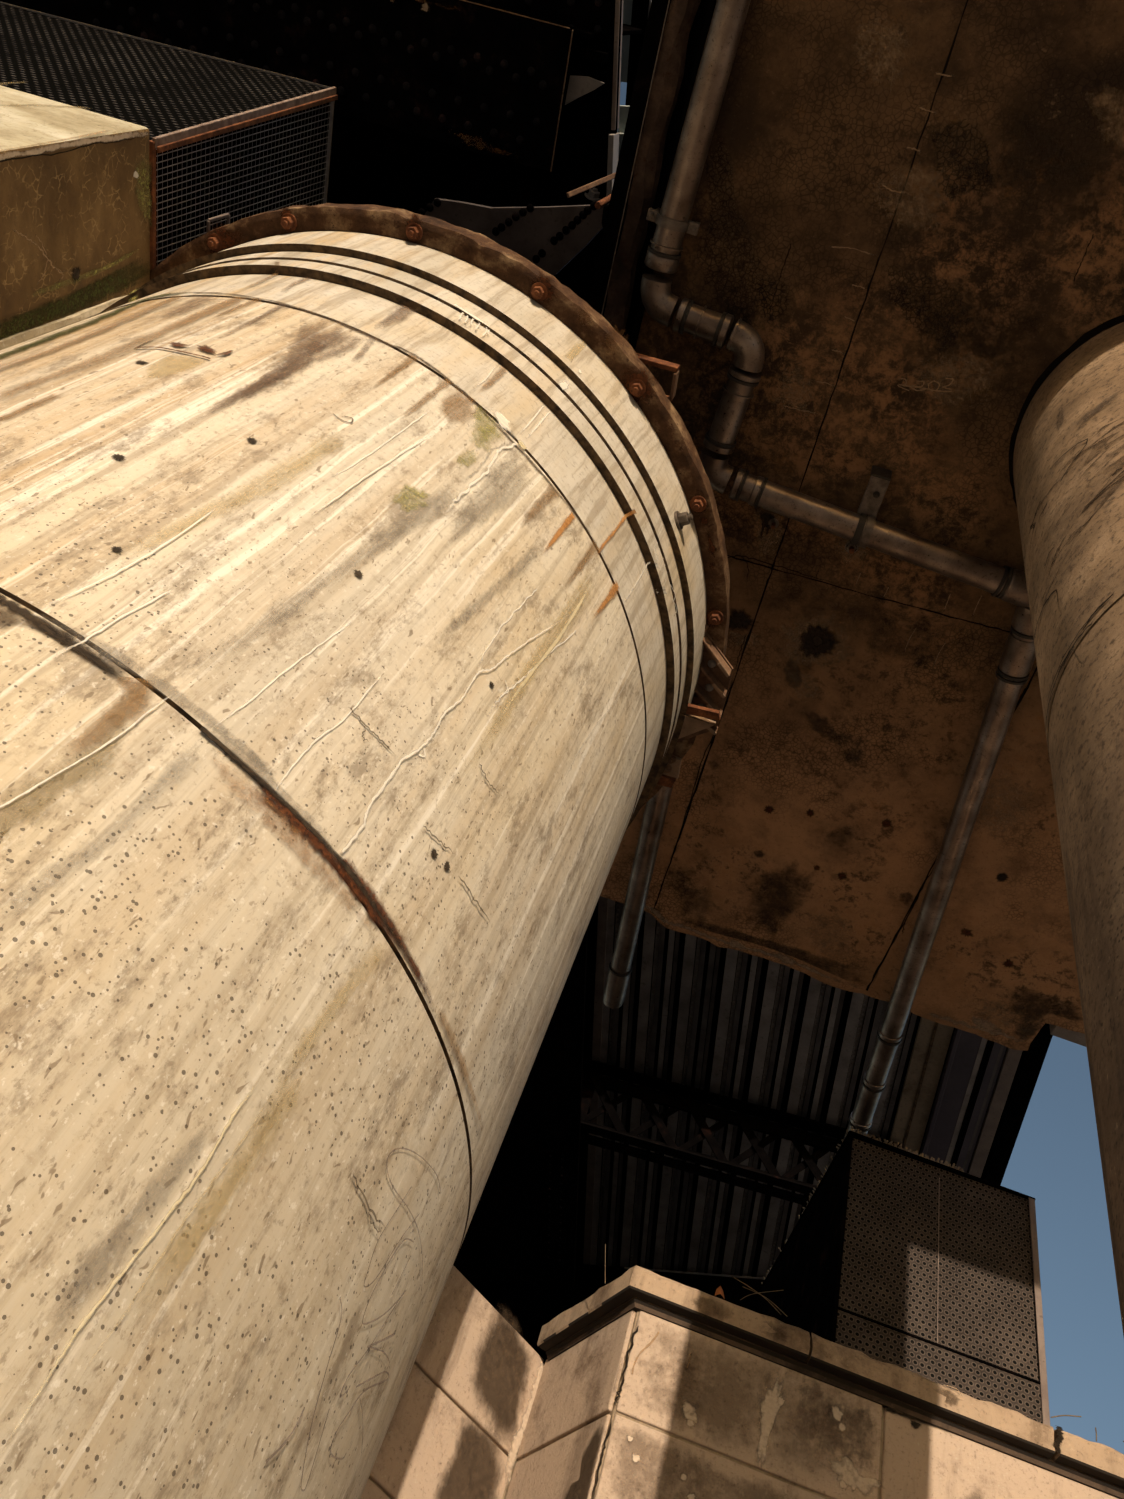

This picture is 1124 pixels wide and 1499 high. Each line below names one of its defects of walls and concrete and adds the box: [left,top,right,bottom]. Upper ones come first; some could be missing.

rust [533,272,556,302]
rust [134,340,233,359]
rust [621,367,656,401]
damp [438,1317,543,1499]
crack [592,1327,638,1499]